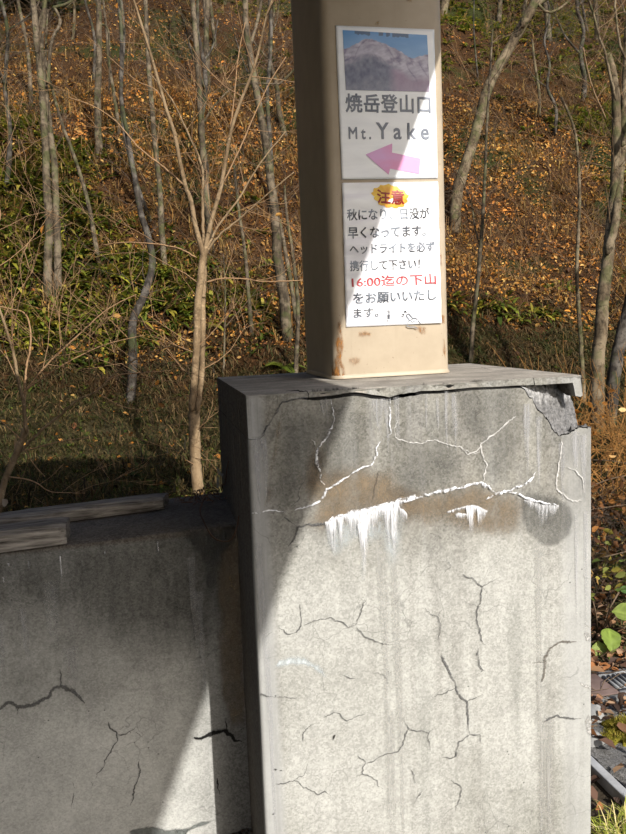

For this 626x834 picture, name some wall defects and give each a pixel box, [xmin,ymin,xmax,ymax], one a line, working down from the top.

rust [332,323,344,380]
spalling [521,384,591,435]
crack [256,367,584,544]
leakage [311,459,513,548]
crack [266,599,384,645]
crack [420,563,496,672]
crack [535,641,576,681]
crack [0,671,85,714]
crack [358,608,481,787]
crack [194,721,245,742]
crack [71,722,140,809]
crack [280,764,328,795]